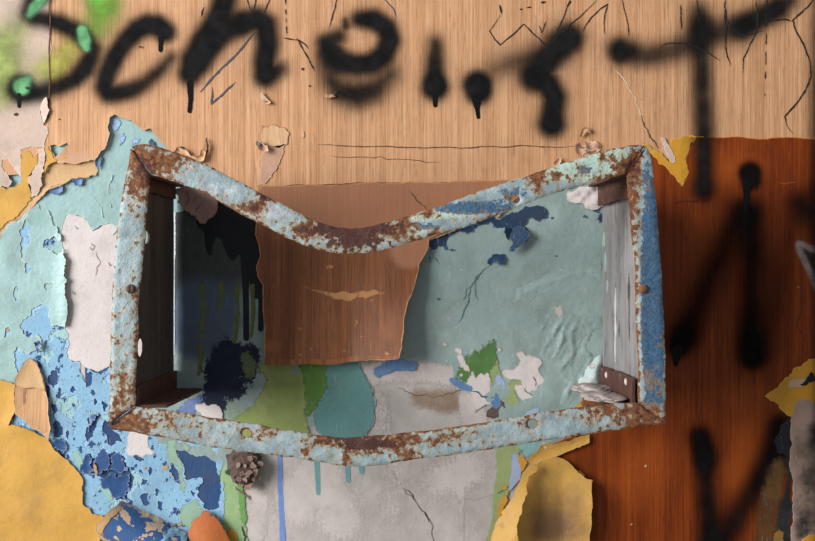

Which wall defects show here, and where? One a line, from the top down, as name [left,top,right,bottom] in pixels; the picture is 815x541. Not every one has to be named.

peeling [110,117,155,146]
peeling [259,124,289,184]
crack [318,144,572,163]
crack [614,68,658,148]
peeling [429,205,554,266]
peeling [583,209,608,293]
crack [459,263,493,322]
peeling [0,204,117,454]
flaking render [443,343,506,419]
flaking render [502,351,544,401]
peeling [80,432,154,499]
crack [387,467,434,541]